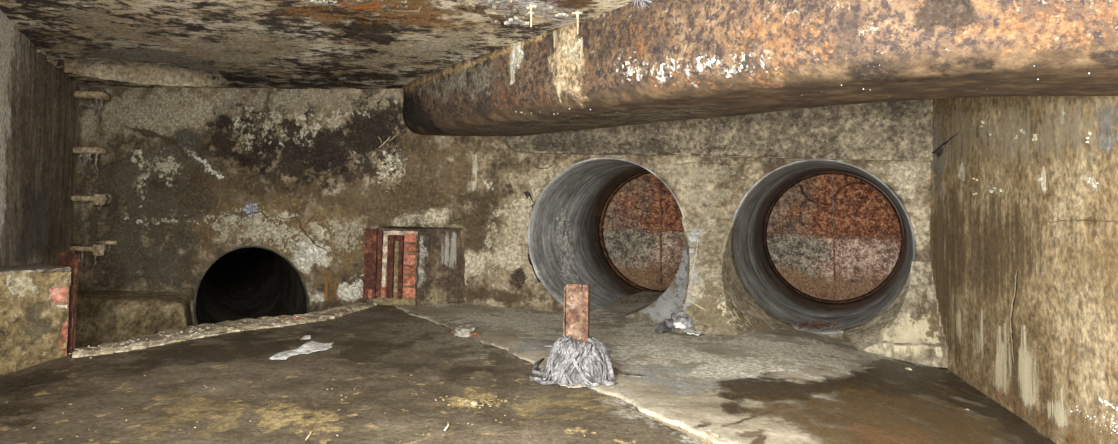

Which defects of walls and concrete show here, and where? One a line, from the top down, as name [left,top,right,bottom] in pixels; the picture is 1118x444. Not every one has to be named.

corrosion [272,0,477,28]
corrosion [728,16,833,88]
corrosion [956,2,1118,52]
damp [0,9,15,250]
damp [476,104,740,156]
damp [77,0,599,413]
damp [515,128,1071,444]
damp [0,367,78,425]
damp [143,395,342,438]